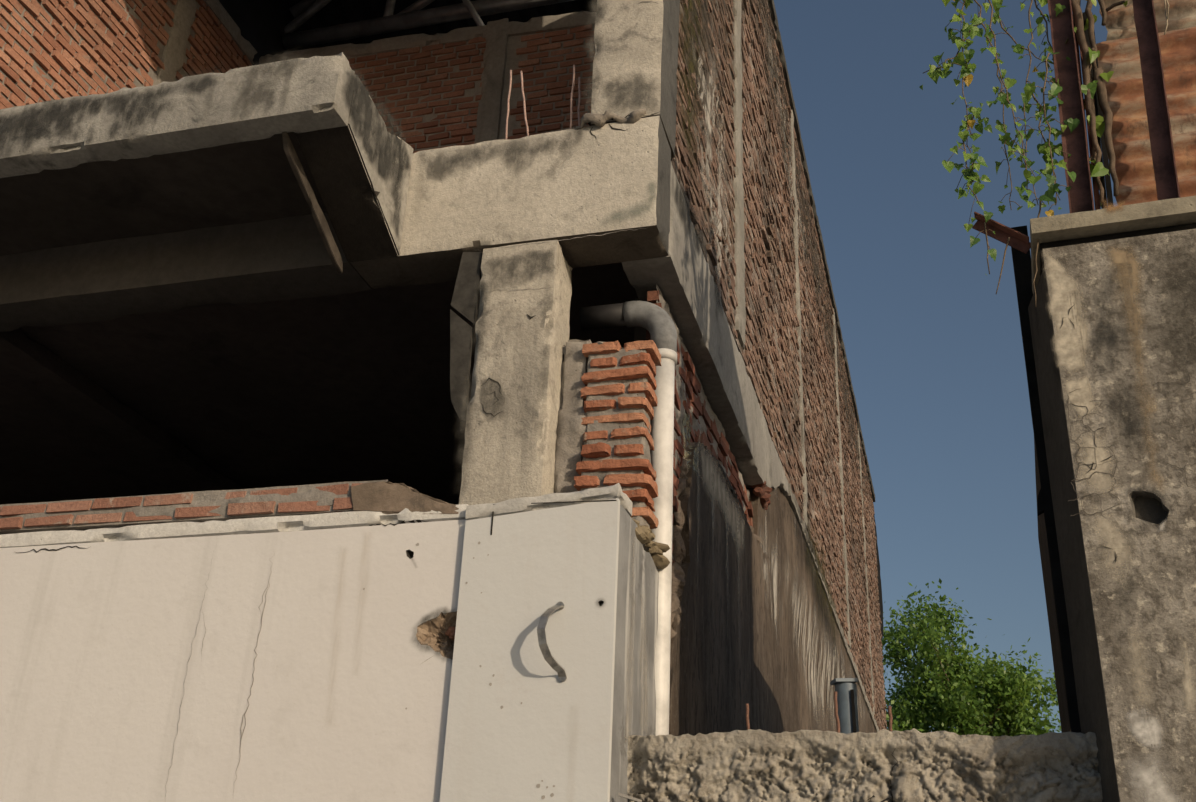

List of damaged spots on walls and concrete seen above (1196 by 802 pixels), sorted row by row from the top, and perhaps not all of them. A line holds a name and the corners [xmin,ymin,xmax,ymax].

spalling [575,108,646,130]
spalling [671,441,763,639]
spalling [748,481,772,510]
damp [763,519,777,620]
crack [1067,389,1120,517]
spalling [1128,490,1169,528]
crack [233,557,272,792]
spalling [416,610,457,664]
damp [793,596,845,705]